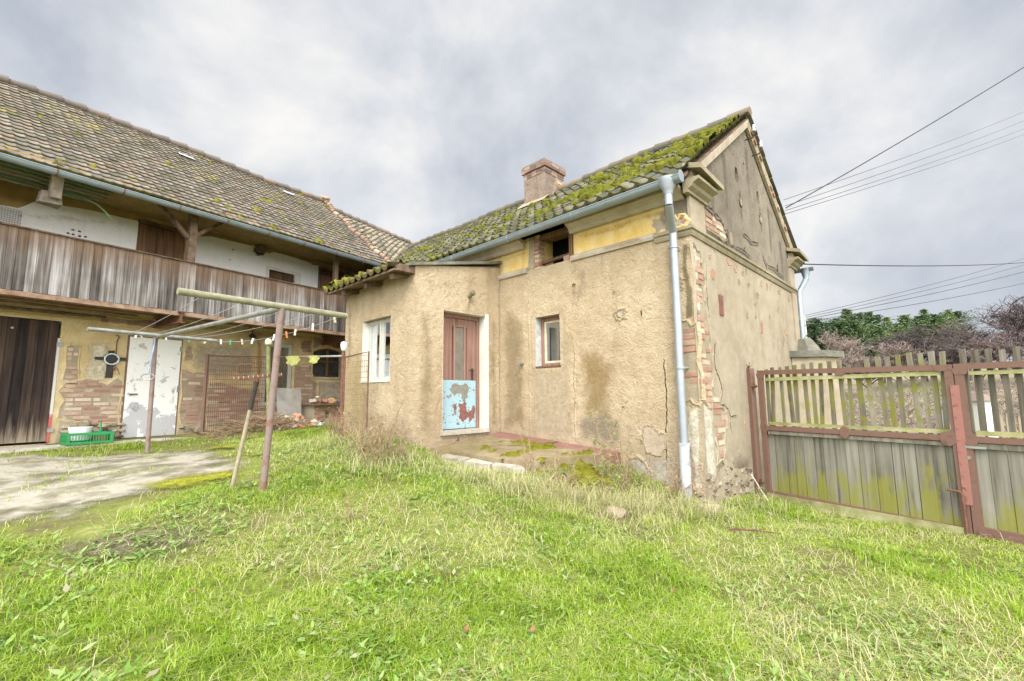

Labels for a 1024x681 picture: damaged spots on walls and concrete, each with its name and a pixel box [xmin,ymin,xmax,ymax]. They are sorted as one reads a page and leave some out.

flaking render [652,213,692,233]
flaking render [679,206,790,466]
flaking render [56,343,138,425]
peeling [442,382,475,443]
damp [583,357,617,438]
flaking render [624,423,667,479]
crack [659,357,670,481]